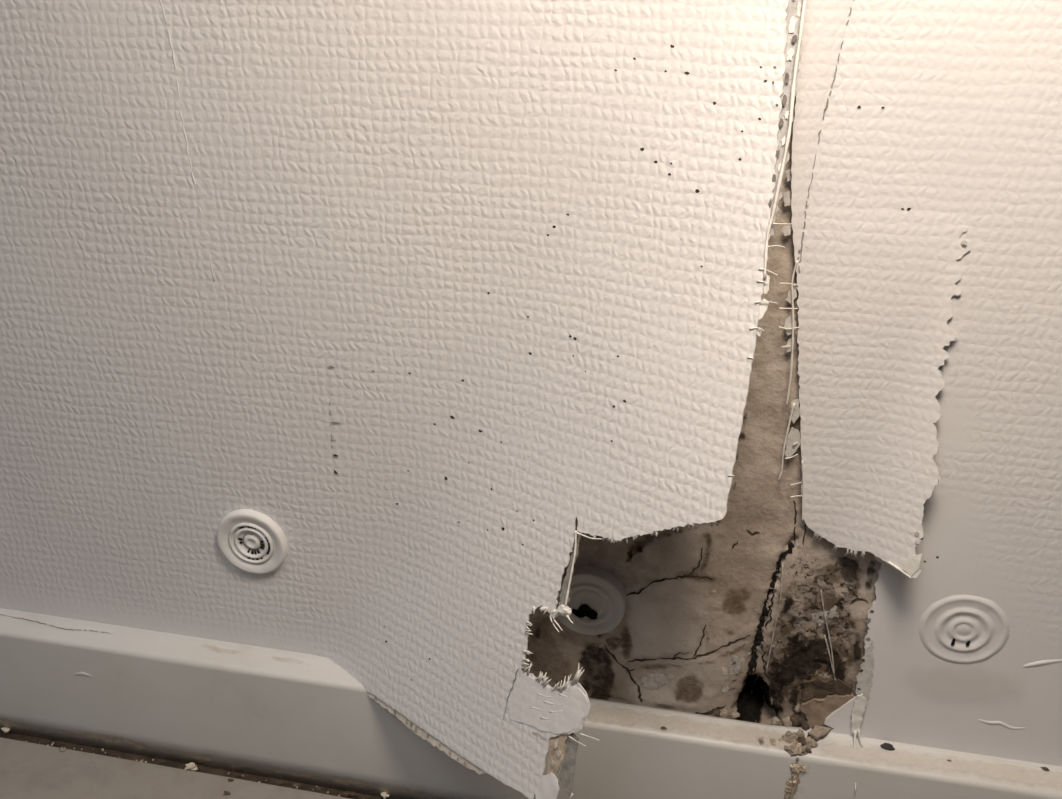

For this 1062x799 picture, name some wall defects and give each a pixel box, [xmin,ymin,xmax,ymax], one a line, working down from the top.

peeling [788,0,802,33]
flaking render [522,86,881,731]
crack [604,501,806,715]
water stain [767,557,875,716]
water stain [721,728,812,799]